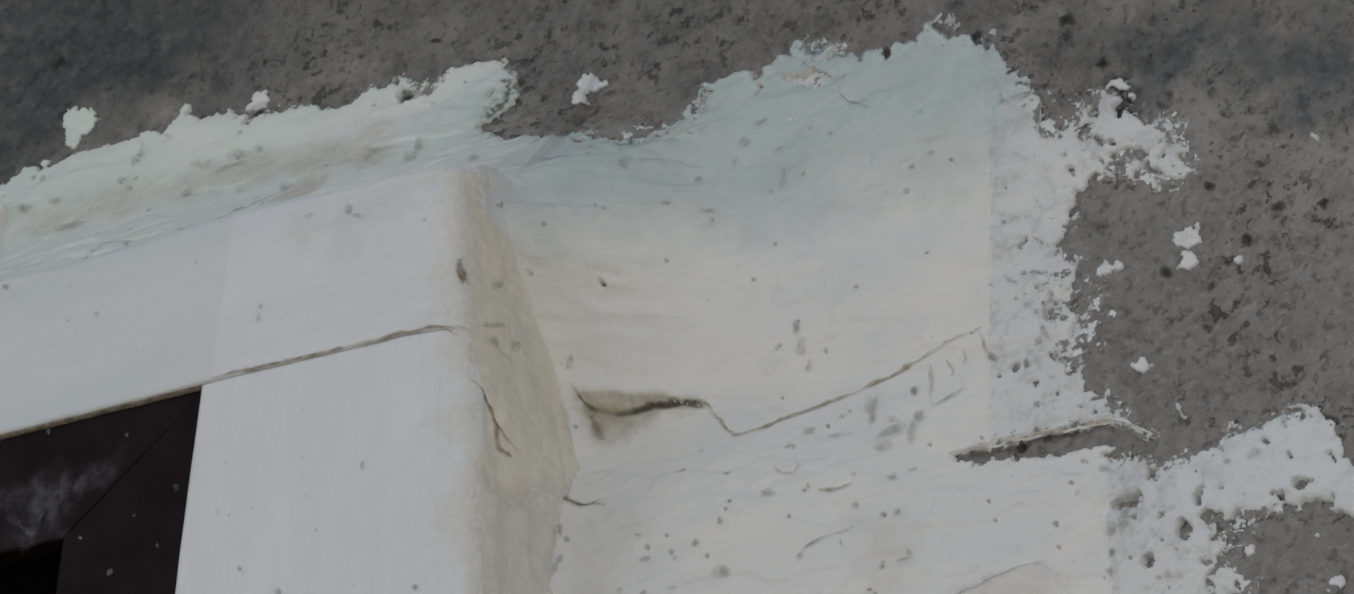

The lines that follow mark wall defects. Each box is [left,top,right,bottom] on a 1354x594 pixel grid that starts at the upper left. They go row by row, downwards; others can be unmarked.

peeling [777,11,961,91]
peeling [954,34,985,48]
peeling [0,56,522,280]
peeling [463,44,1354,594]
crack [694,327,986,435]